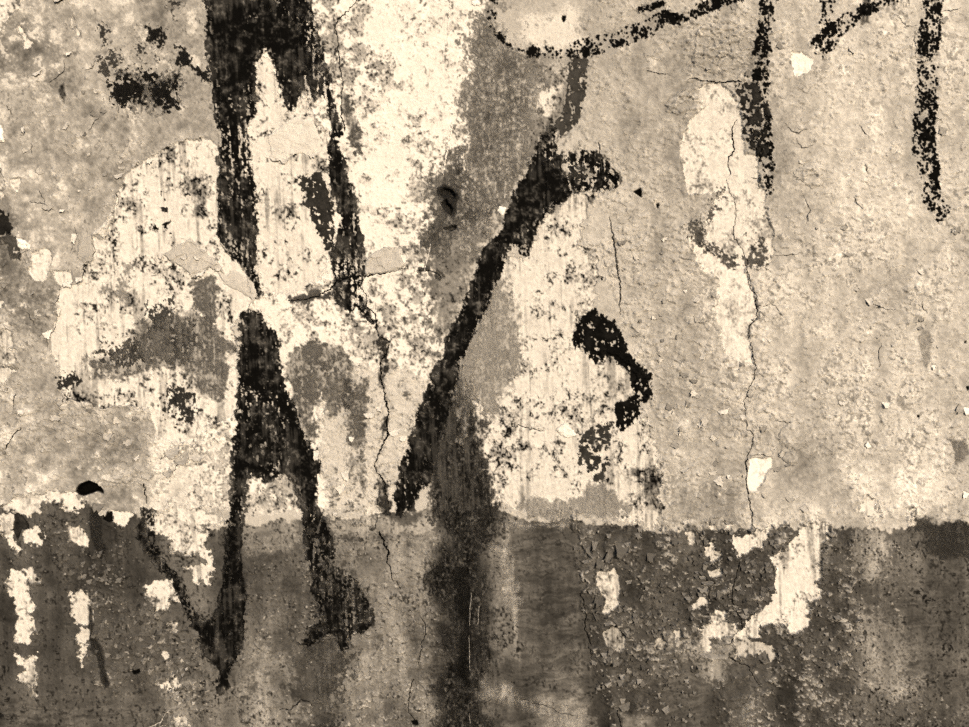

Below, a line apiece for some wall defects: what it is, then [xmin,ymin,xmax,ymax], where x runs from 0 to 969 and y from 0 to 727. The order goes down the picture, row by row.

peeling [0,0,22,31]
peeling [18,25,33,49]
crack [335,0,359,131]
peeling [0,50,336,480]
peeling [679,83,776,371]
peeling [4,567,42,697]
peeling [0,488,134,553]
peeling [68,525,195,727]
peeling [144,502,224,585]
crack [288,267,441,589]
damp [419,373,521,727]
peeling [467,182,867,727]